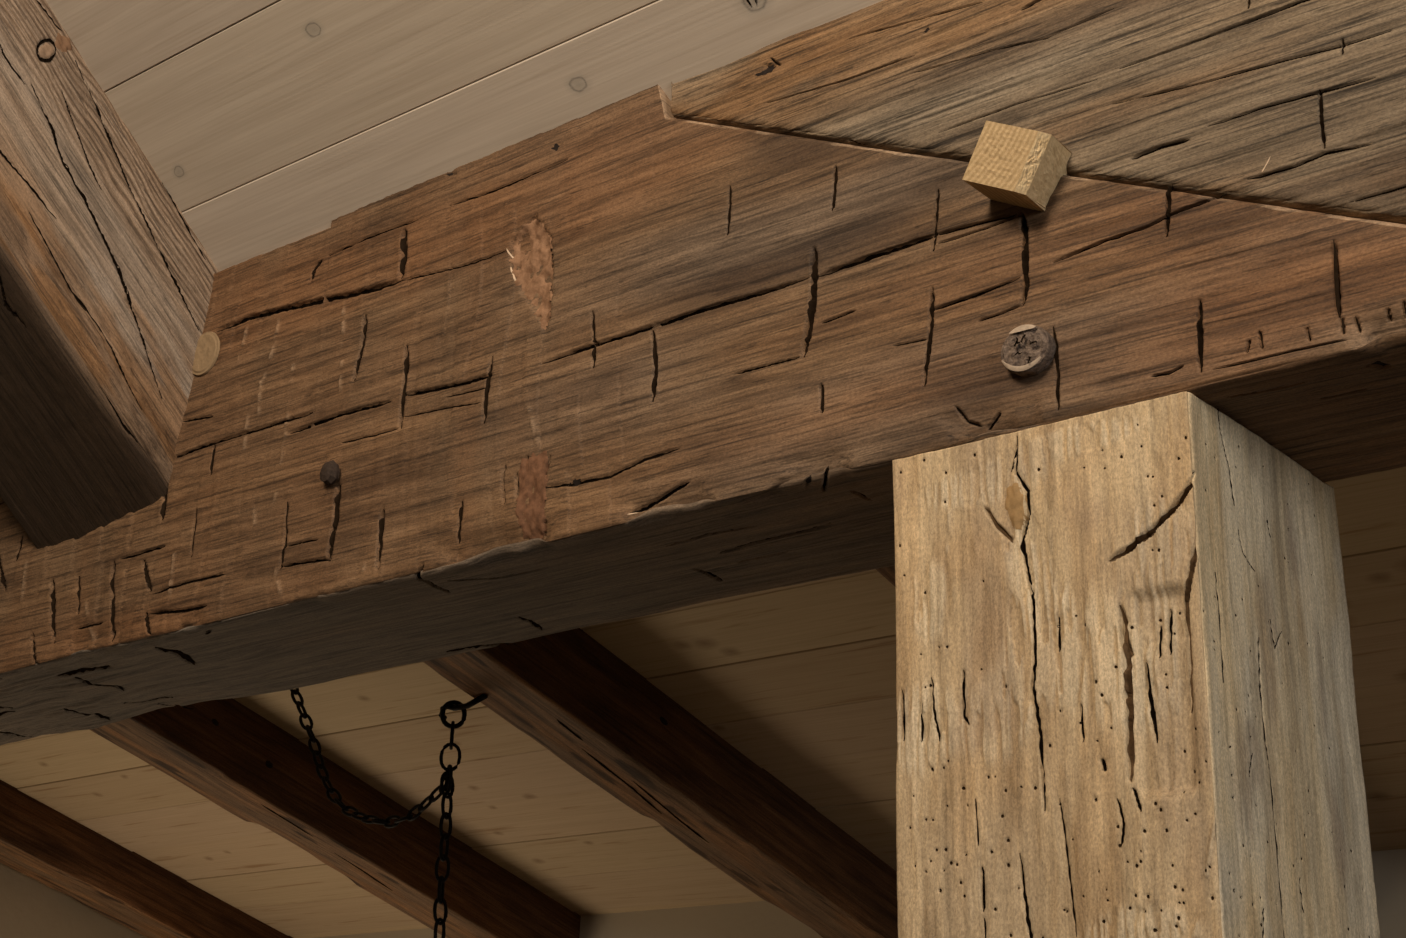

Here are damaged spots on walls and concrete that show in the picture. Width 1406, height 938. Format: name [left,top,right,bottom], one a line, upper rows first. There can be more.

crack [0,0,506,458]
crack [450,160,566,206]
crack [542,214,1037,364]
crack [1056,144,1371,262]
crack [1351,186,1406,202]
crack [737,357,799,374]
crack [1215,340,1346,683]
crack [956,407,1077,938]
crack [1081,704,1142,846]